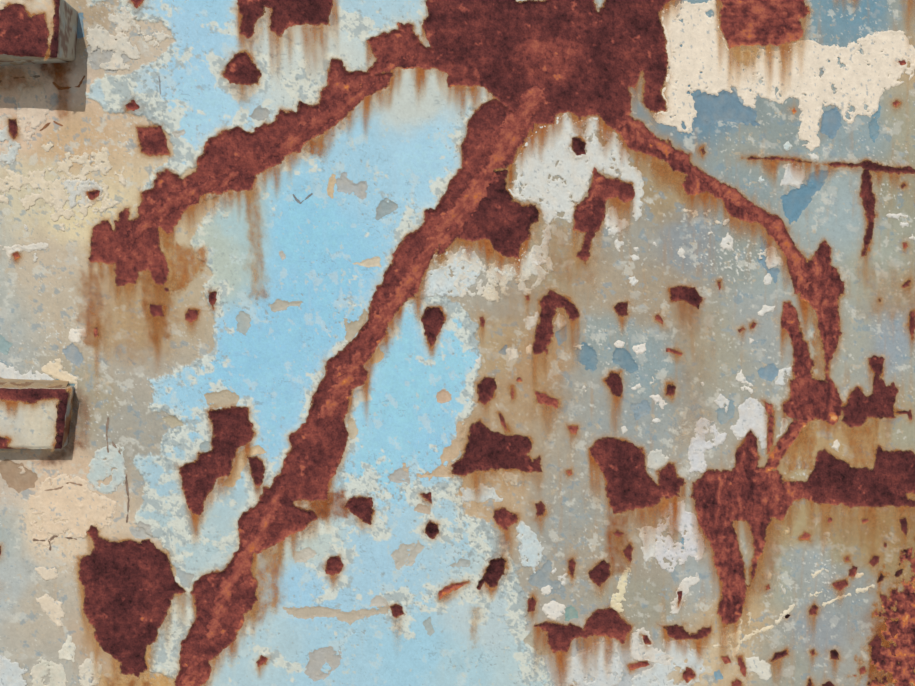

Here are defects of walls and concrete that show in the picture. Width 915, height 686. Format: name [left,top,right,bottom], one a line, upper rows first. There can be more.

corrosion [221,0,337,91]
peeling [0,242,49,262]
peeling [0,81,126,231]
corrosion [573,167,635,264]
peeling [653,0,915,224]
peeling [0,444,127,549]
corrosion [179,406,266,532]
corrosion [451,377,542,493]
corrosion [588,437,686,590]
corrosion [691,401,915,646]
peeling [0,594,102,686]
corrosion [77,525,186,686]